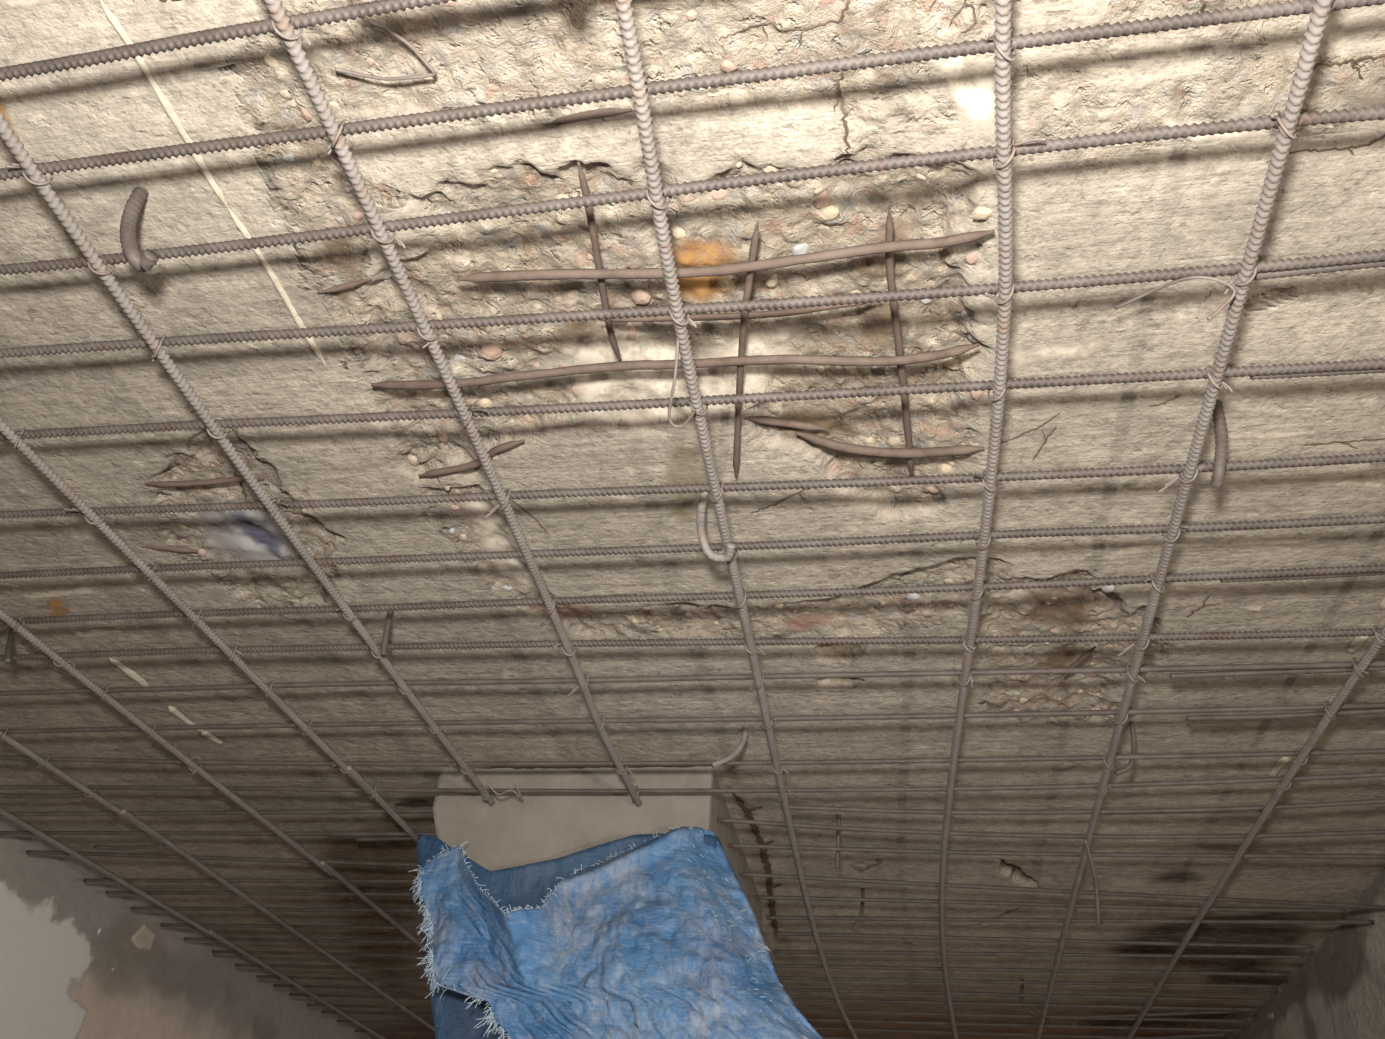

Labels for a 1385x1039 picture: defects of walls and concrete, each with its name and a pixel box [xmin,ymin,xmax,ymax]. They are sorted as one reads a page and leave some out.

crack [719,0,851,46]
crack [1313,54,1385,80]
crack [1267,134,1385,162]
corrosion [675,242,731,299]
spalling [113,0,1385,740]
flaking render [0,881,102,1039]
flaking render [130,922,157,951]
leakage [1085,868,1385,1039]